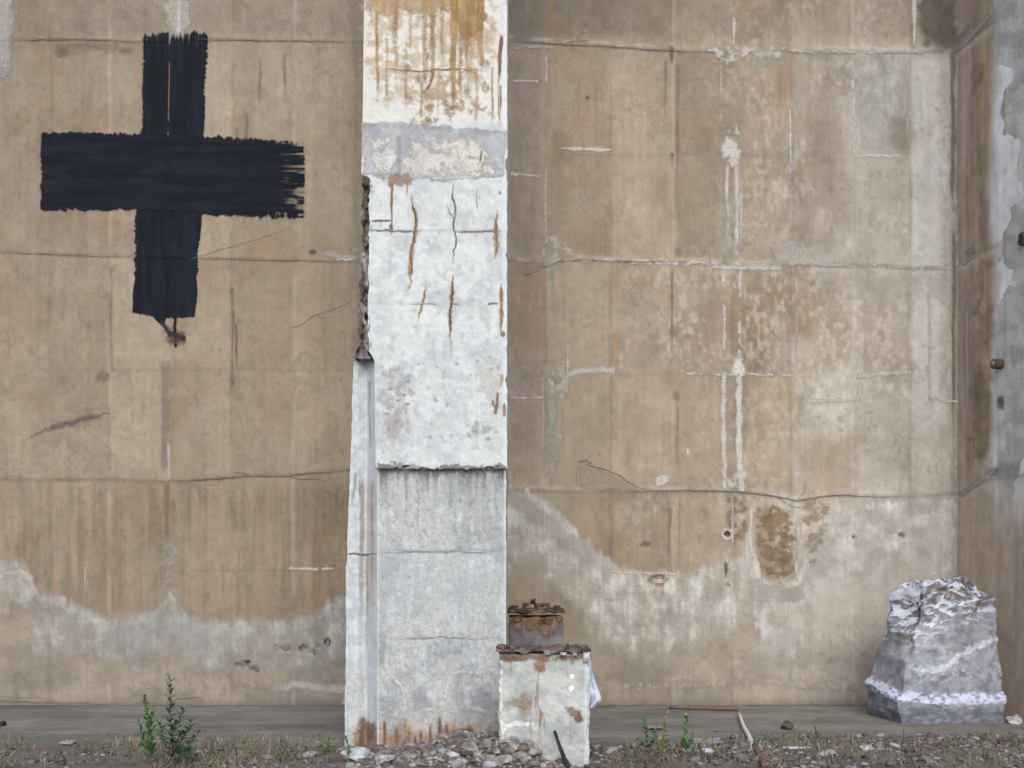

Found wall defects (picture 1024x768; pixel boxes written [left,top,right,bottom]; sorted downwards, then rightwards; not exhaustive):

corrosion [365,0,503,119]
corrosion [388,173,412,233]
crack [372,199,457,304]
peeling [355,65,507,362]
crack [447,185,501,264]
damp [380,0,1024,659]
crack [171,469,350,481]
crack [576,459,908,507]
damp [0,367,364,737]
corrosion [500,653,583,675]
damp [914,663,1002,684]
corrosion [354,718,499,746]